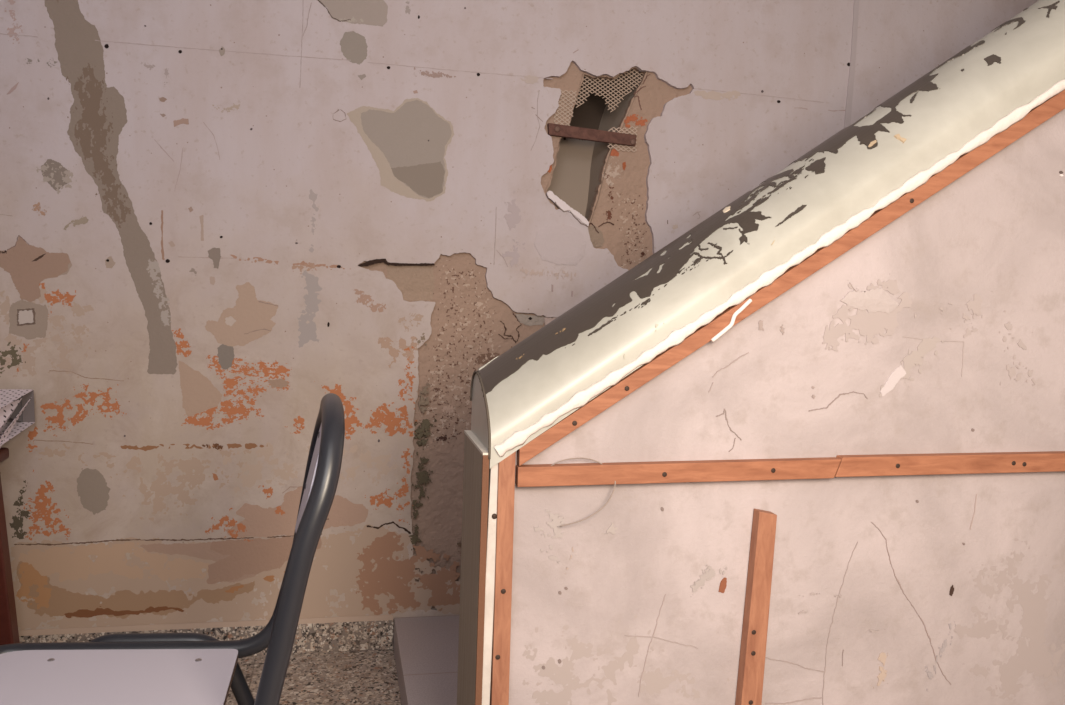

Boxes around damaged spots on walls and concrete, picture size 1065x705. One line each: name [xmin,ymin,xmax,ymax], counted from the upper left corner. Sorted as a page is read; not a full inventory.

peeling [141,62,189,127]
corrosion [547,123,637,147]
spalling [0,235,76,324]
spalling [314,1,1060,582]
peeling [172,328,192,357]
spalling [181,282,292,430]
damp [36,442,298,522]
corrosion [121,443,264,451]
peeling [285,416,305,441]
damp [299,382,461,618]
damp [9,480,288,630]